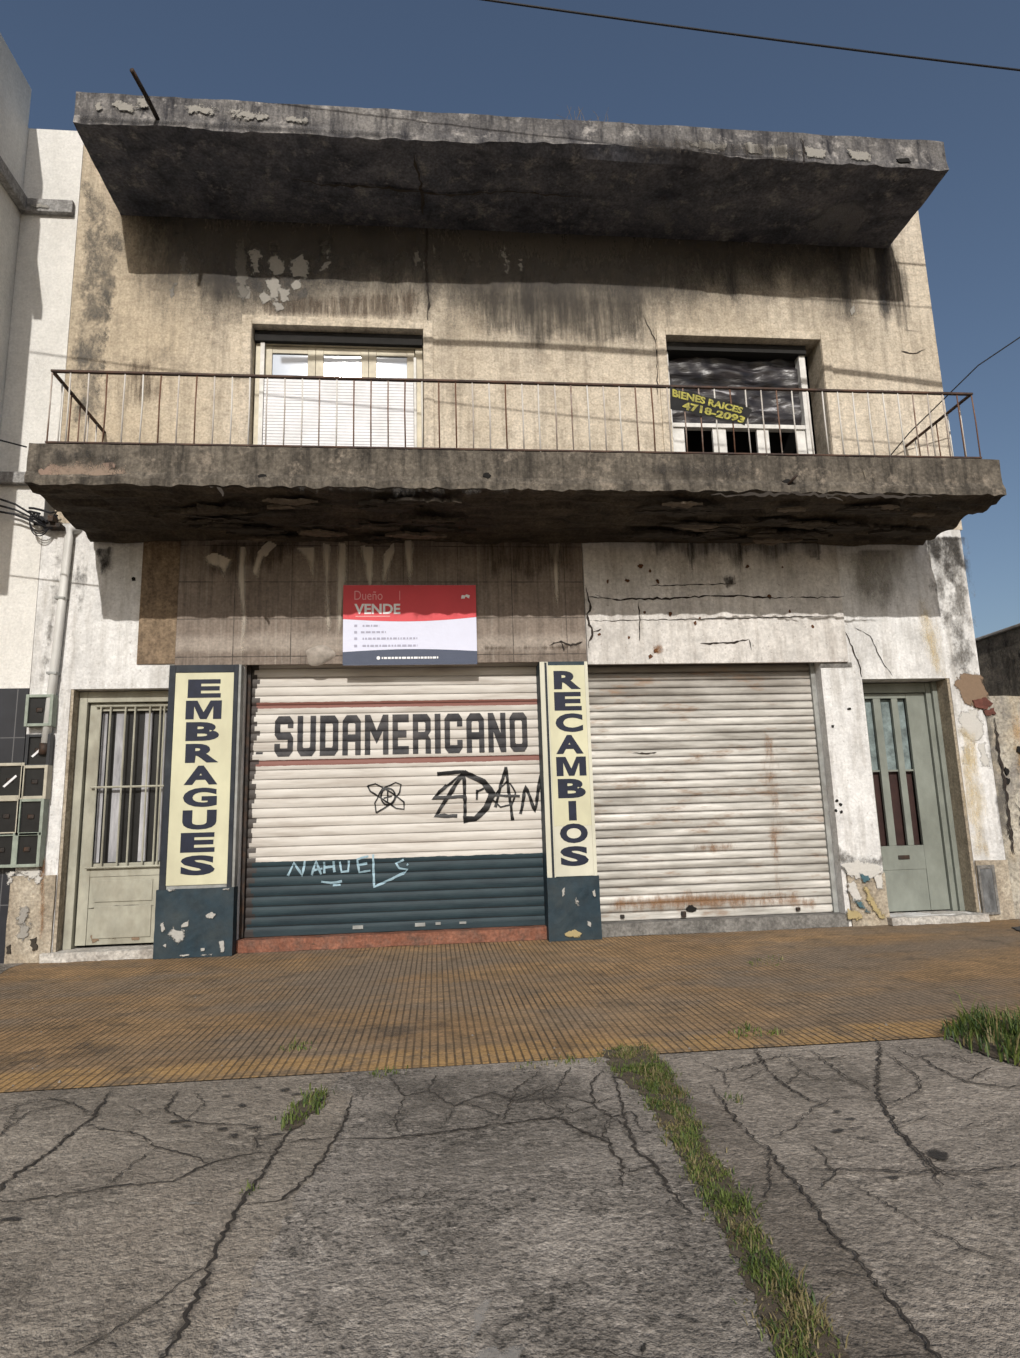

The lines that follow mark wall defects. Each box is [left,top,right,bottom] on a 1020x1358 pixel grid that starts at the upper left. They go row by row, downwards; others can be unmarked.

peeling [95,98,149,113]
peeling [186,103,308,124]
damp [75,184,122,420]
peeling [235,240,331,312]
damp [264,293,414,315]
damp [486,274,641,342]
damp [812,203,907,315]
crack [551,583,892,676]
peeling [954,673,1010,784]
peeling [842,859,886,921]
peeling [160,920,224,957]
peeling [565,921,591,938]